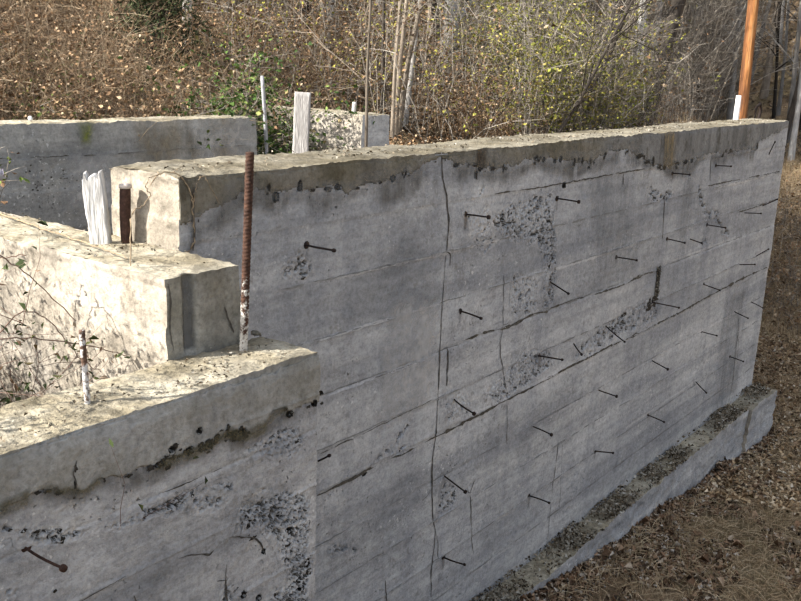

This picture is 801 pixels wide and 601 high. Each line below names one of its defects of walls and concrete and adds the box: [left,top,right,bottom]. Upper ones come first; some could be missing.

peeling [178,122,789,362]
peeling [0,354,415,601]
crack [423,158,451,592]